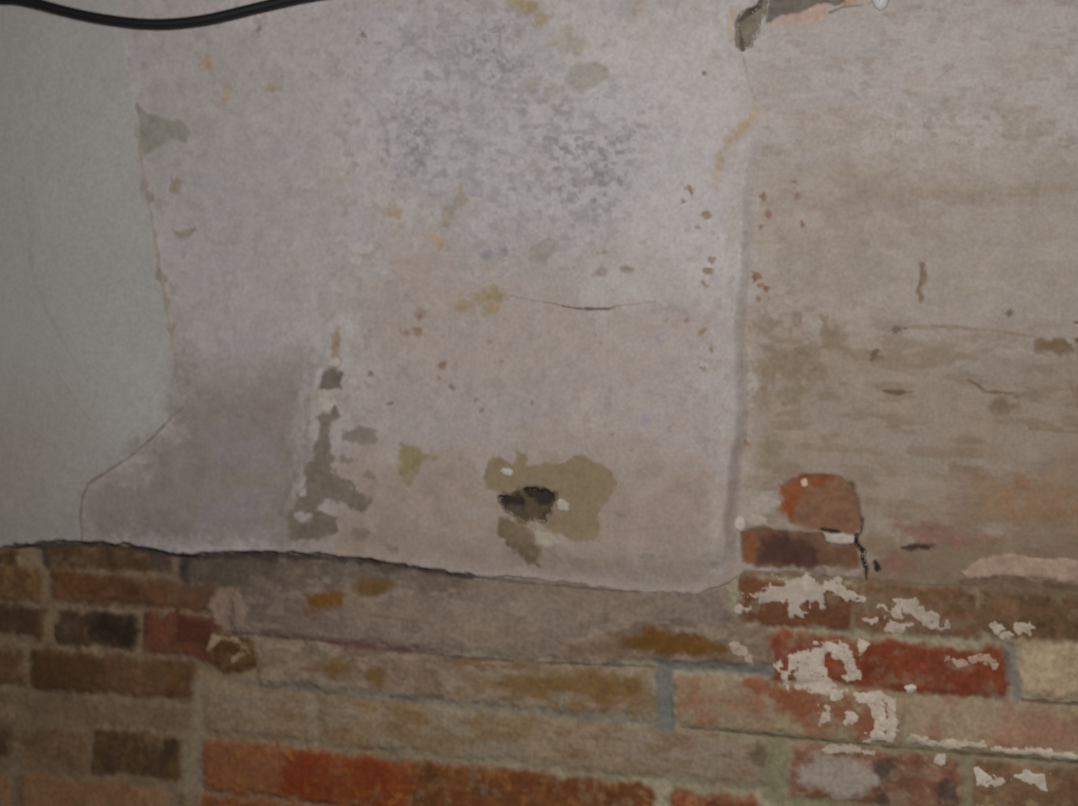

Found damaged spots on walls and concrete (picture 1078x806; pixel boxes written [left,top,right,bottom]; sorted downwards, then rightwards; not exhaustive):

spalling [725,0,864,53]
peeling [134,101,193,403]
crack [504,293,658,311]
leakage [730,91,1078,479]
crack [11,405,639,594]
peeling [284,325,380,543]
spalling [482,449,618,571]
spalling [733,471,954,635]
crack [818,517,882,581]
peeling [877,512,1078,593]
peeling [987,620,1037,641]
peeling [772,637,1078,793]